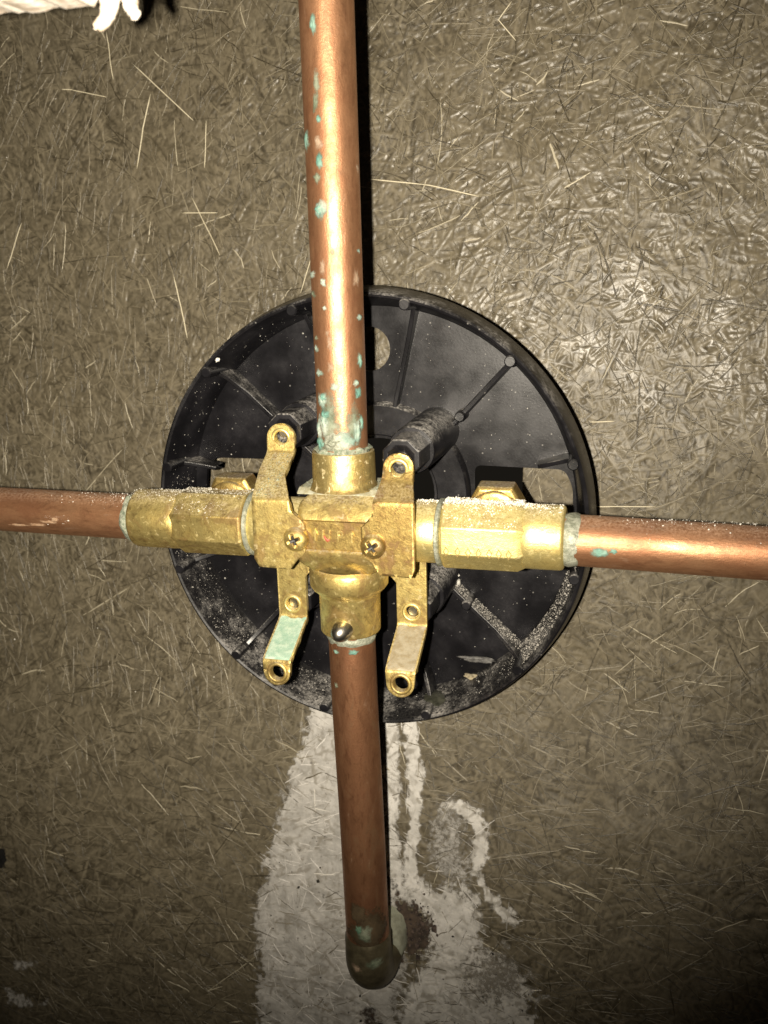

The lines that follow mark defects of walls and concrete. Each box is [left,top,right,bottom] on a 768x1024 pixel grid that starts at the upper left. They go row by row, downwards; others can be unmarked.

leakage [249,707,549,1024]